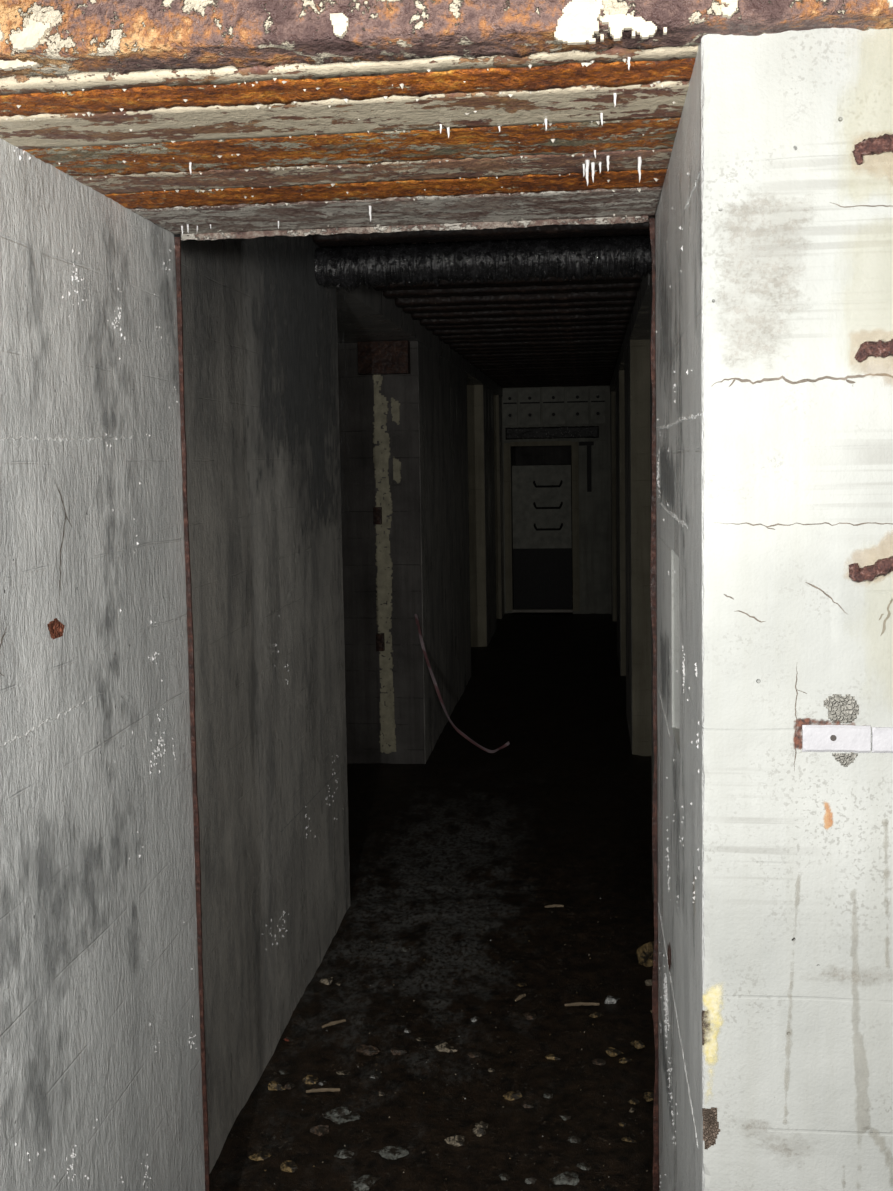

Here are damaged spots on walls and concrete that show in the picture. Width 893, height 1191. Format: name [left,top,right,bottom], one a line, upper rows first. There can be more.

peeling [0,19,52,71]
peeling [330,13,349,38]
peeling [554,0,667,45]
peeling [721,0,739,19]
corrosion [0,58,695,117]
corrosion [22,118,680,177]
corrosion [104,169,667,209]
crack [711,373,893,387]
leakage [660,449,682,514]
leakage [26,844,102,926]
spalling [702,1107,720,1149]